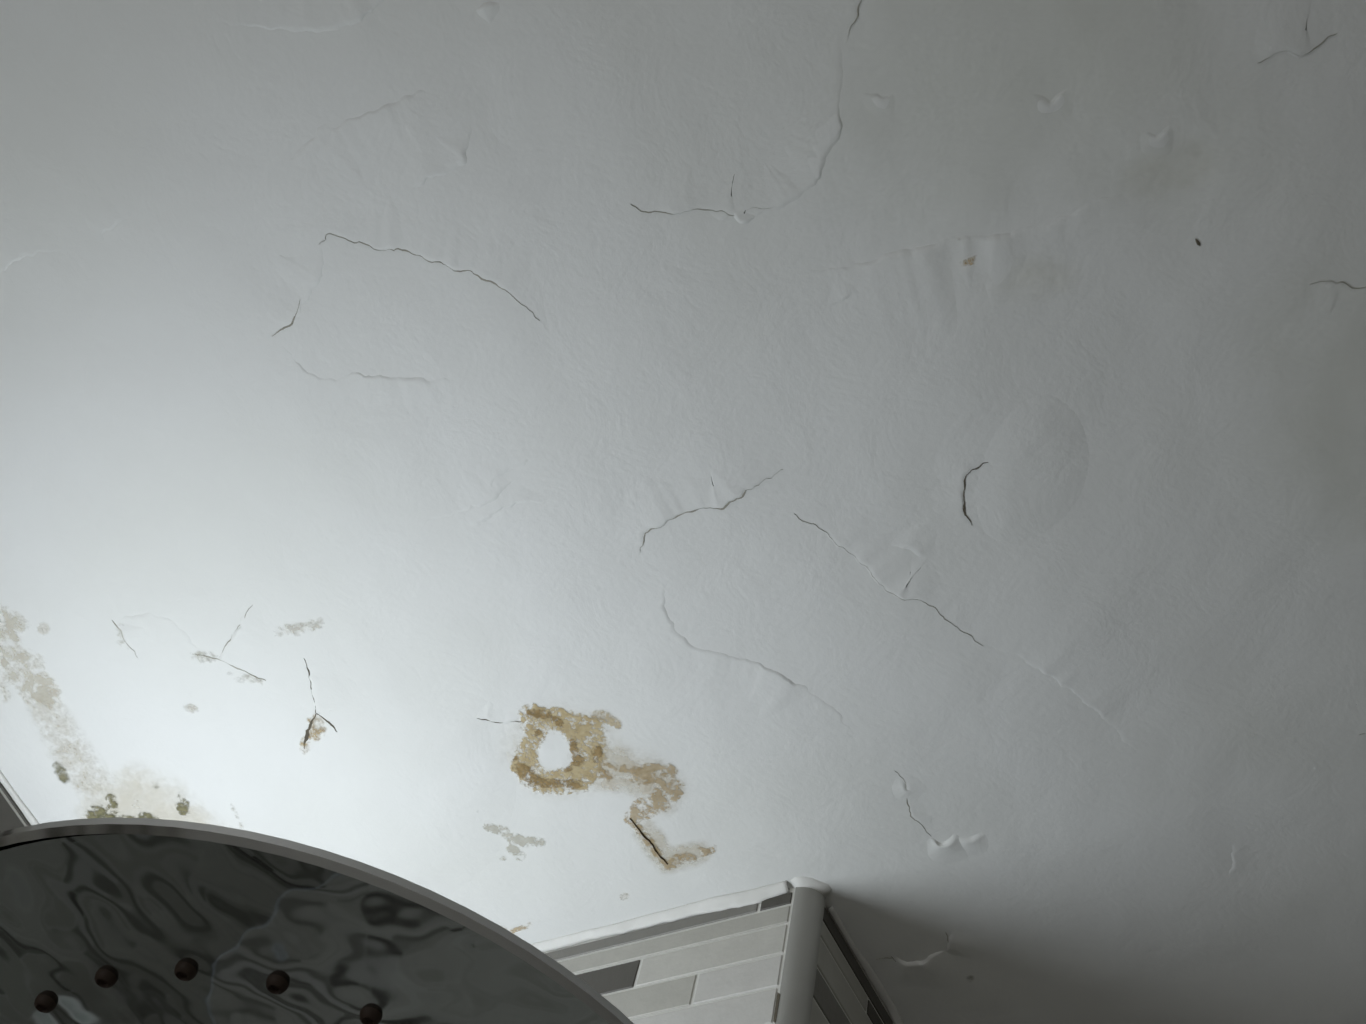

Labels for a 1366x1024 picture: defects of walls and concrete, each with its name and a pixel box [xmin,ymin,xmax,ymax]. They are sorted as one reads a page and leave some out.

water stain [56,763,68,783]
water stain [87,794,155,819]
water stain [176,800,189,815]